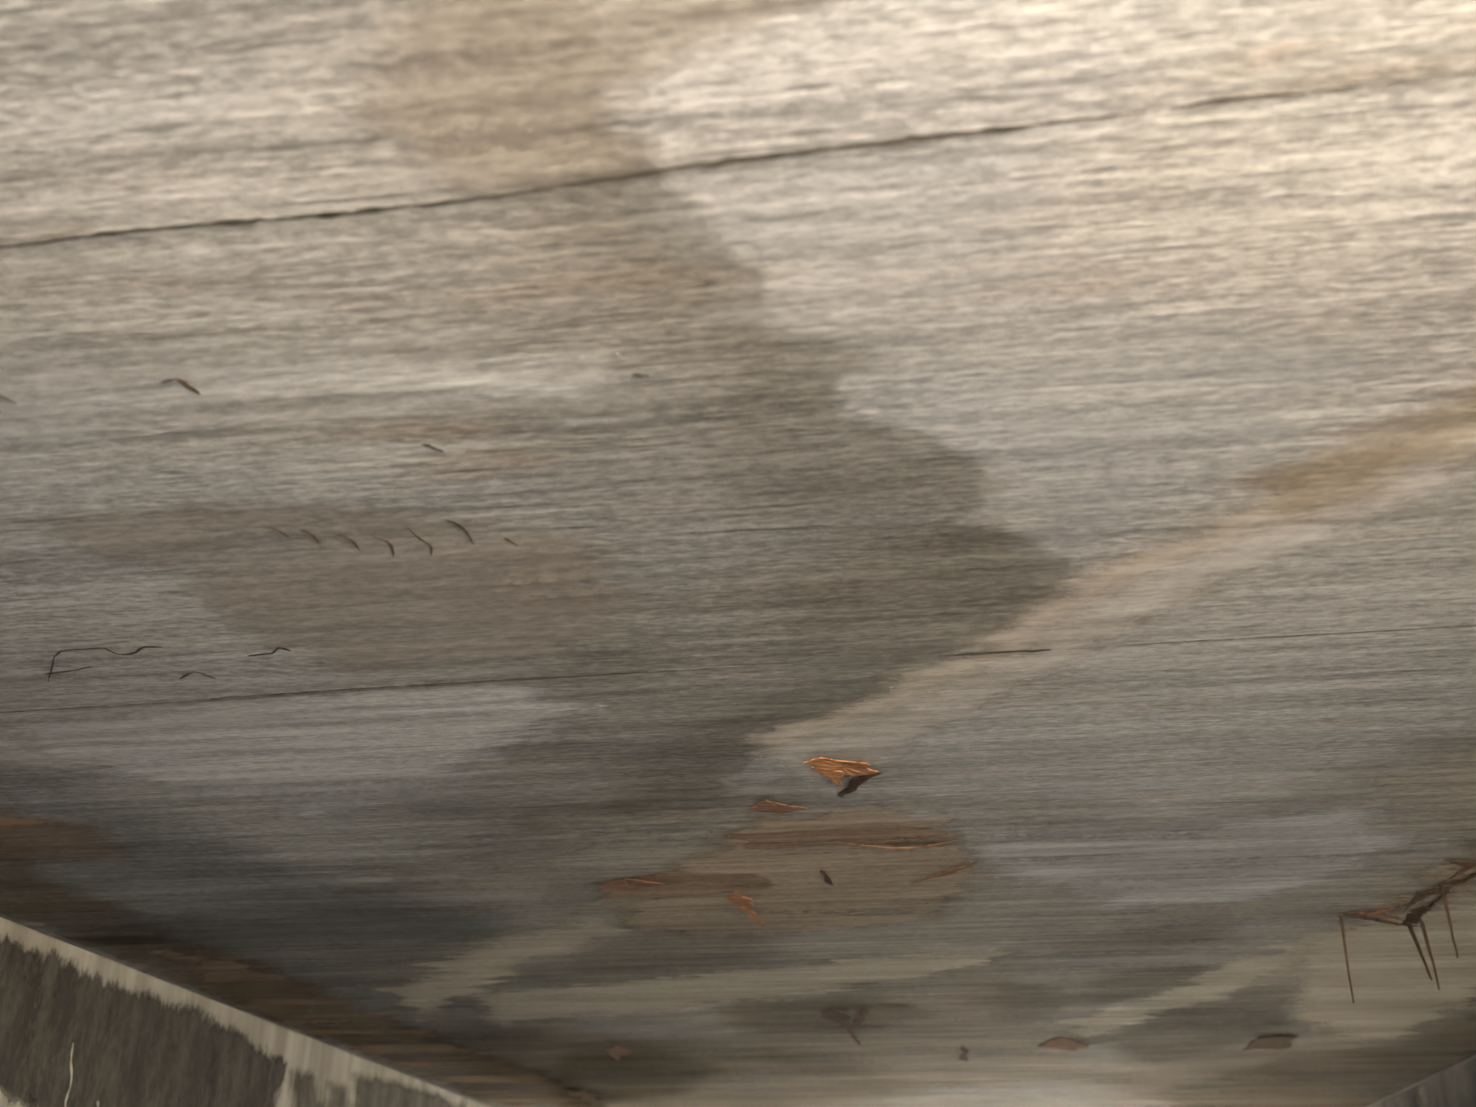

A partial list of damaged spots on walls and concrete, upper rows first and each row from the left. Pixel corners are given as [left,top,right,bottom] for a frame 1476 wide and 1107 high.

crack [0,71,1476,248]
leakage [0,357,612,419]
crack [937,625,1476,657]
crack [0,646,755,713]
leakage [0,409,1476,1107]
peeling [811,766,882,797]
peeling [1243,1035,1298,1050]